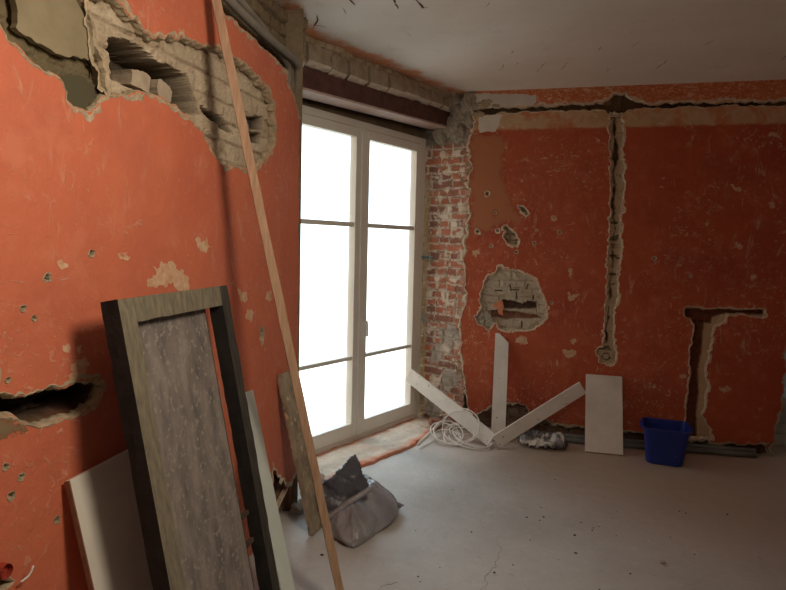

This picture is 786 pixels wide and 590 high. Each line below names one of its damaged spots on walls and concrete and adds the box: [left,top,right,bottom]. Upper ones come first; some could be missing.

spalling [0,0,277,174]
flaking render [221,0,786,427]
flaking render [0,368,107,429]
flaking render [529,419,585,435]
spalling [683,305,768,453]